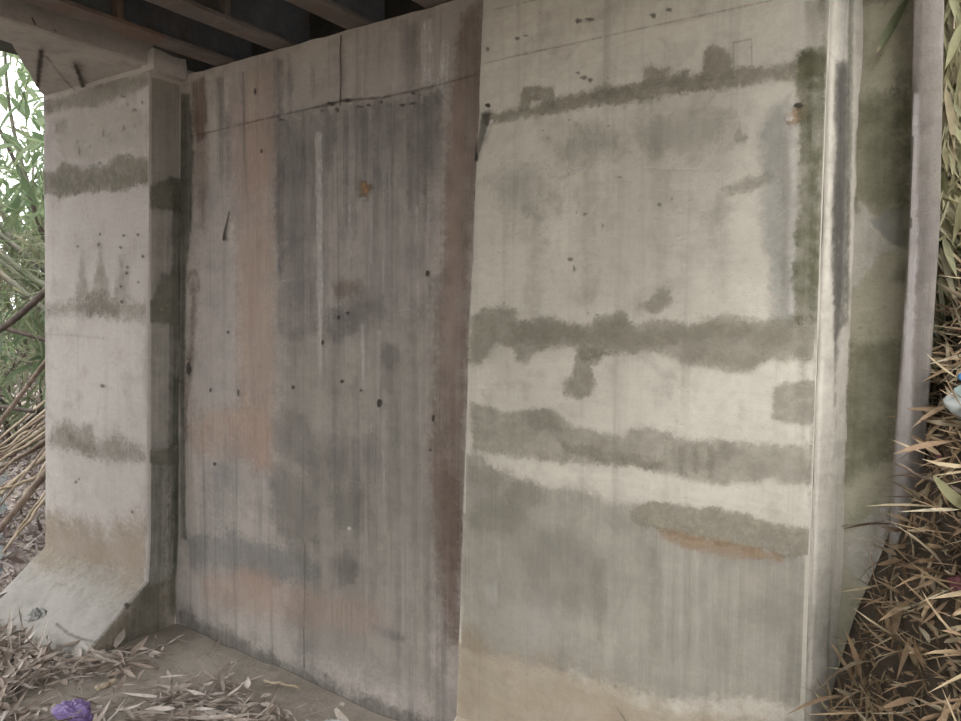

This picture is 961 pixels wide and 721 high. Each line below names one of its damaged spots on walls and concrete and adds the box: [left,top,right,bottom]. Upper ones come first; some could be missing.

damp [484,25,853,334]
damp [43,79,218,642]
damp [470,290,815,398]
damp [463,459,809,702]